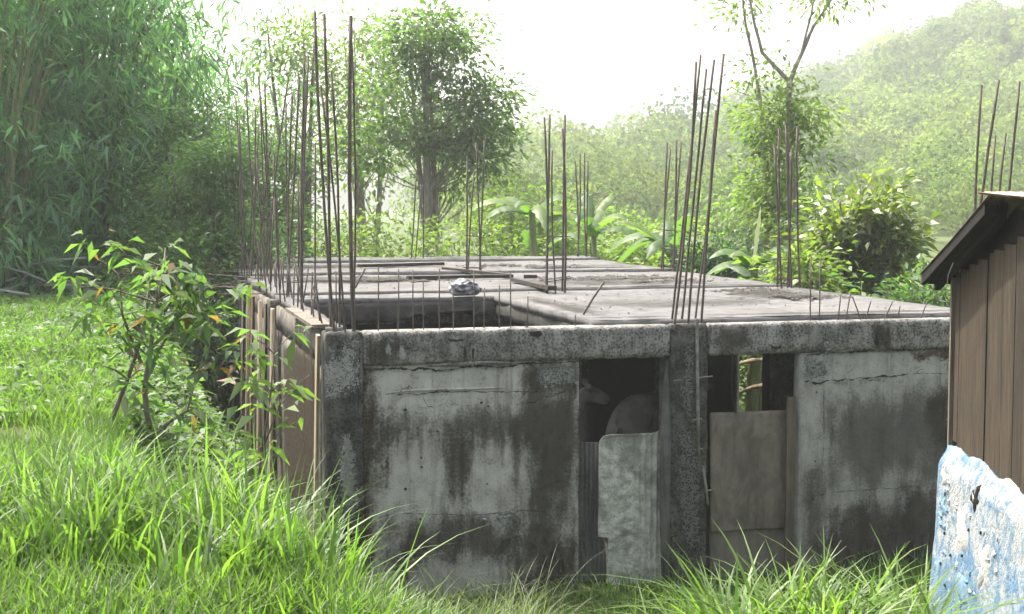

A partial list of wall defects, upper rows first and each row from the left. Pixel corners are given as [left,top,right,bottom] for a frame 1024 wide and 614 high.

leakage [336,338,593,594]
crack [358,348,578,413]
crack [804,348,948,496]
leakage [814,389,948,571]
peeling [933,461,998,614]